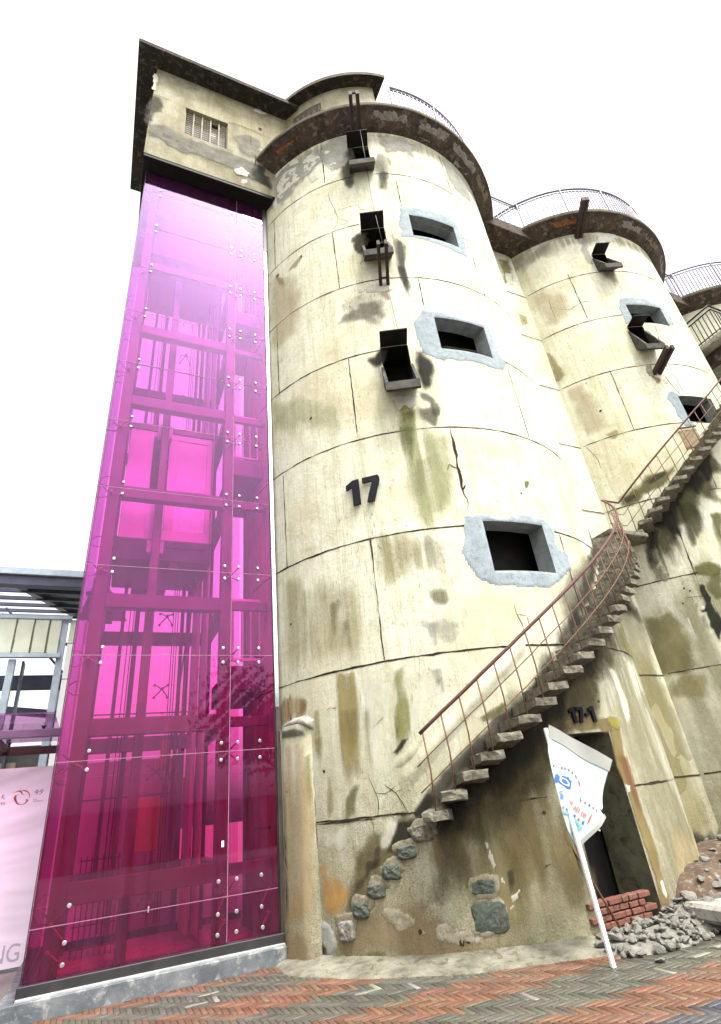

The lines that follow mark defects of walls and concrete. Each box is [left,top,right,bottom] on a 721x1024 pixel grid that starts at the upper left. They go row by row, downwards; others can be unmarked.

water stain [146,97,271,189]
peeling [272,136,348,212]
water stain [368,349,387,366]
water stain [401,352,449,520]
crack [447,430,469,505]
water stain [621,468,673,506]
water stain [647,453,721,579]
water stain [331,672,370,772]
water stain [346,562,721,923]
crack [313,778,409,839]